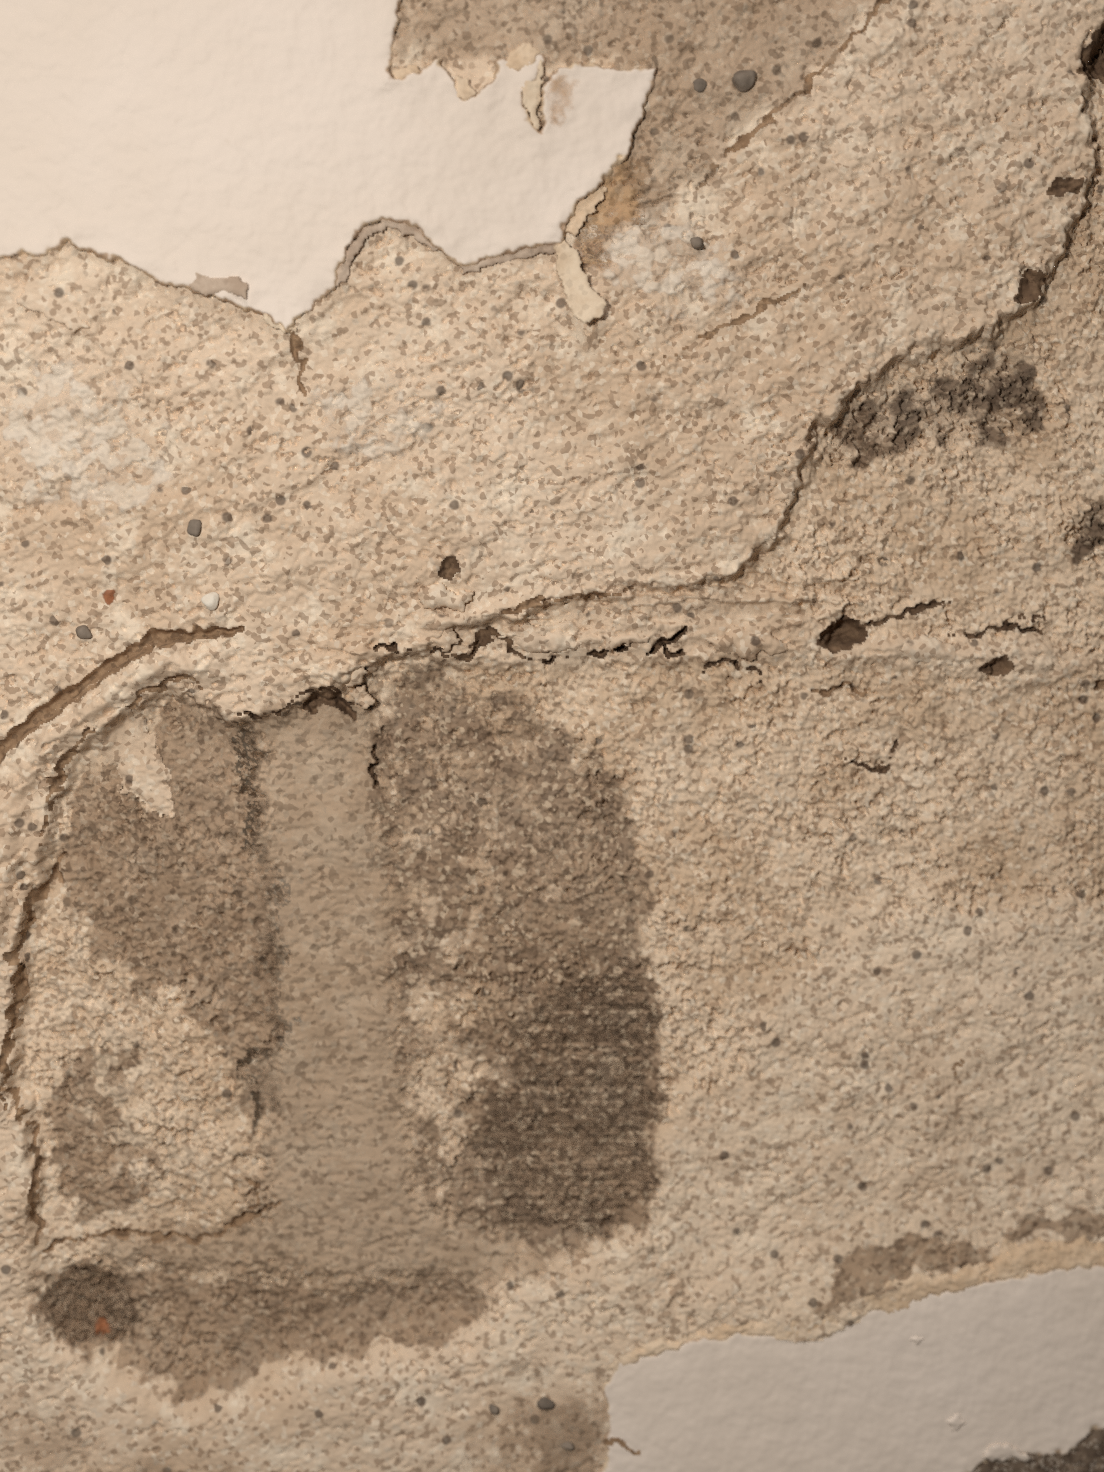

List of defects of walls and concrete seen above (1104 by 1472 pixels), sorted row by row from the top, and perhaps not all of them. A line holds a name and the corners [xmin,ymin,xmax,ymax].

peeling [553,240,607,324]
flaking render [418,582,474,612]
flaking render [513,621,582,653]
crack [373,586,762,683]
flaking render [705,625,791,661]
crack [861,599,1046,639]
crack [811,681,871,697]
crack [237,686,403,789]
crack [844,739,898,774]
leakage [30,660,666,1406]
flaking render [387,877,520,1225]
flaking render [973,1429,1104,1472]